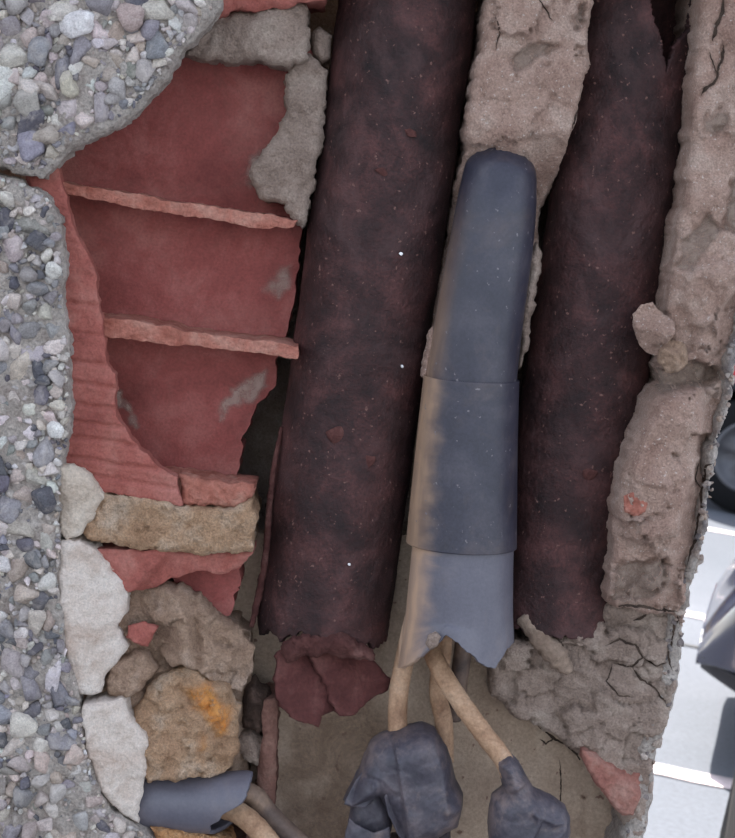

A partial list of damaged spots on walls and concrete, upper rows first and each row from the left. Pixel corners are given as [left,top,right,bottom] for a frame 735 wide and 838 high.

spalling [648,360,726,392]
spalling [624,492,648,516]
spalling [57,463,159,823]
crack [486,603,683,836]